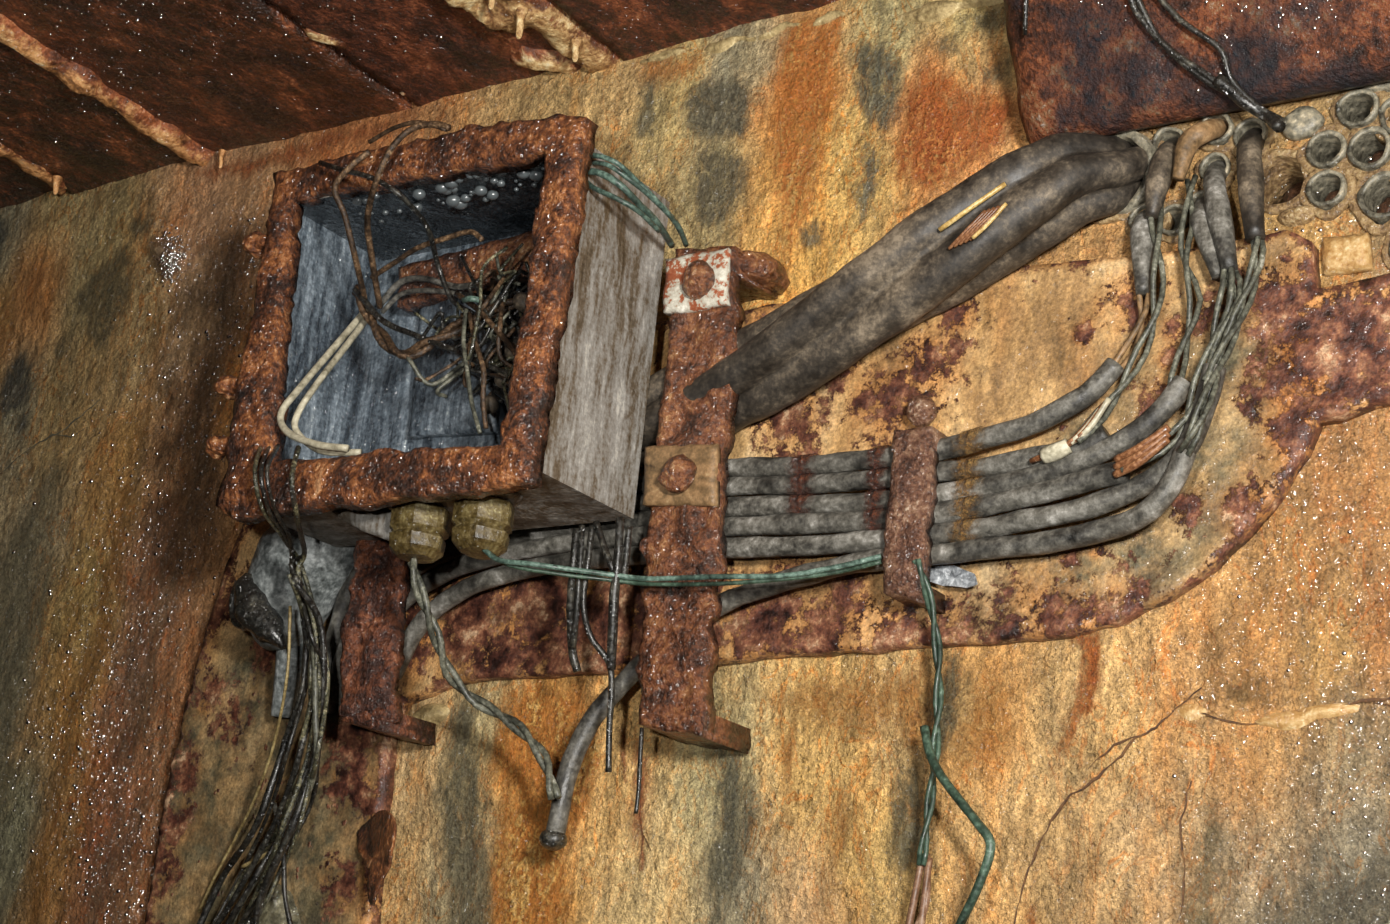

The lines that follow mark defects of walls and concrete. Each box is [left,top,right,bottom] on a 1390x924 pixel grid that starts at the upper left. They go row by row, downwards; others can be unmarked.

water stain [686,76,748,227]
water stain [640,10,846,65]
corrosion [775,18,841,250]
water stain [858,146,876,221]
water stain [855,47,898,126]
corrosion [899,75,1009,189]
corrosion [864,445,888,530]
corrosion [952,426,987,541]
corrosion [1061,634,1099,749]
crack [1342,697,1390,706]
crack [1014,687,1258,924]
water stain [1277,873,1390,924]